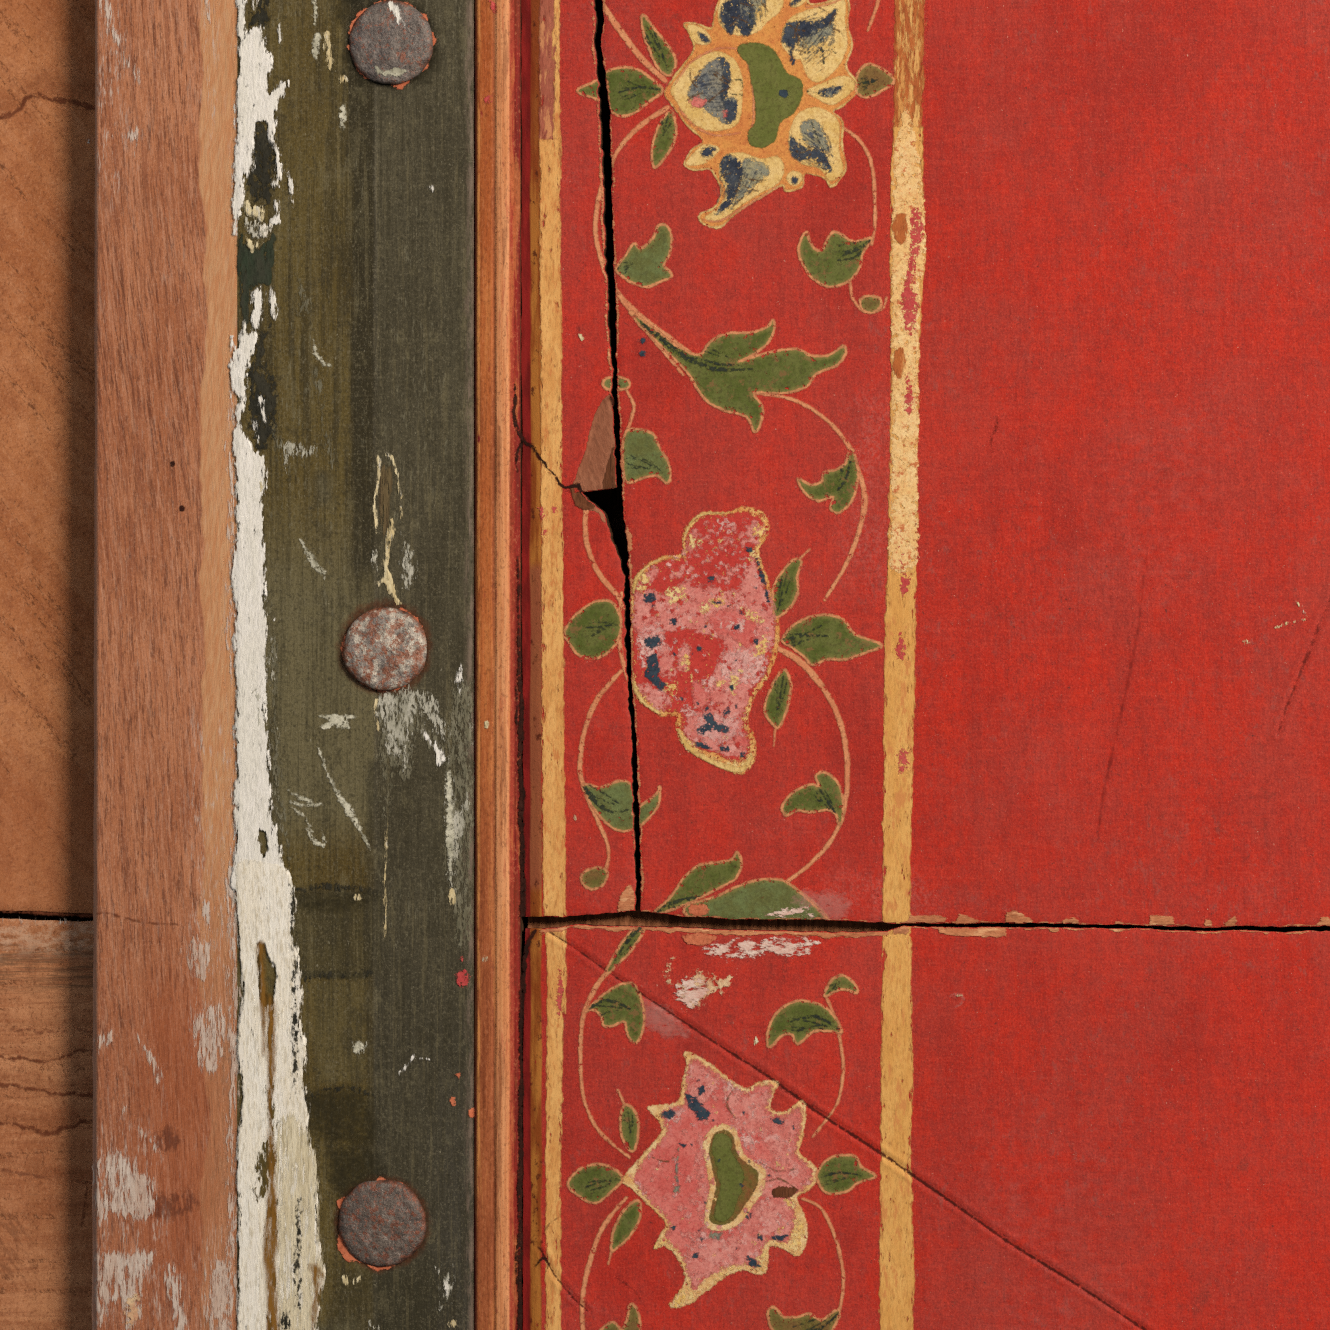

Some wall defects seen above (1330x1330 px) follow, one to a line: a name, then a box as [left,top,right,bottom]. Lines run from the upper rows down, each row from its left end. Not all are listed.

peeling [99,0,140,84]
peeling [312,0,348,84]
peeling [181,0,326,1330]
crack [512,0,1330,1330]
peeling [137,1034,162,1084]
peeling [93,1148,157,1227]
peeling [94,1250,189,1330]
rust [337,1230,395,1271]